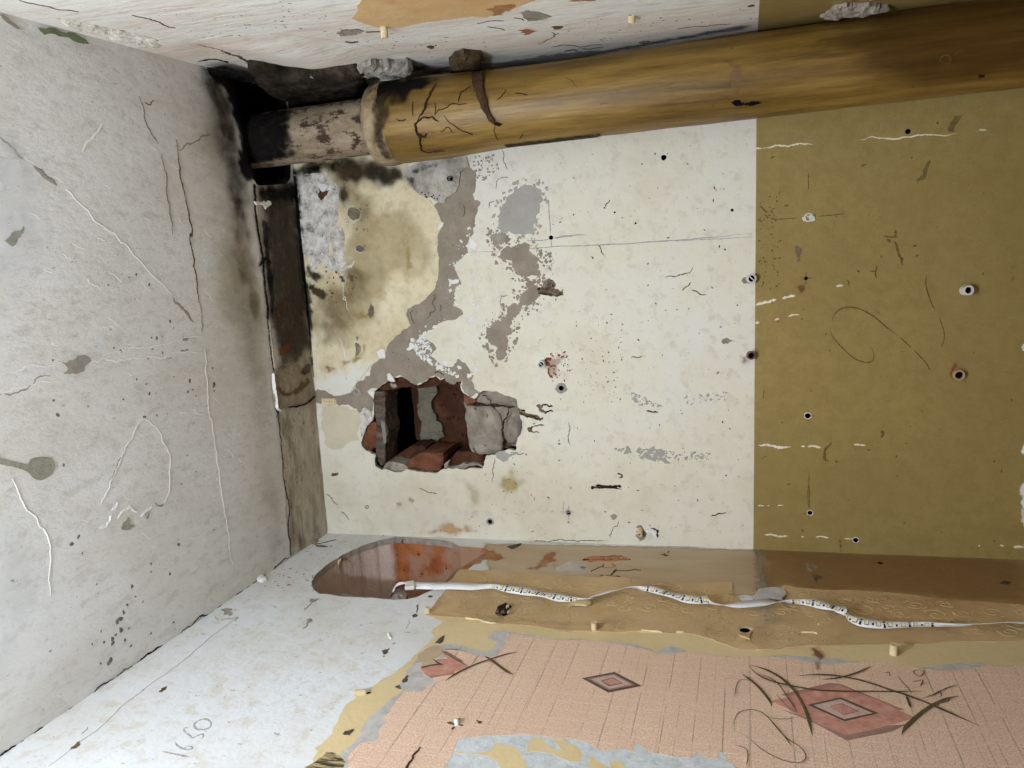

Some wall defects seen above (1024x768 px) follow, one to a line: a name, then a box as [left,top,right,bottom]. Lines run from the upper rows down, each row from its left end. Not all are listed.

peeling [324,0,585,49]
crack [253,184,275,371]
flaking render [272,154,567,450]
crack [49,408,291,766]
crack [0,725,46,756]